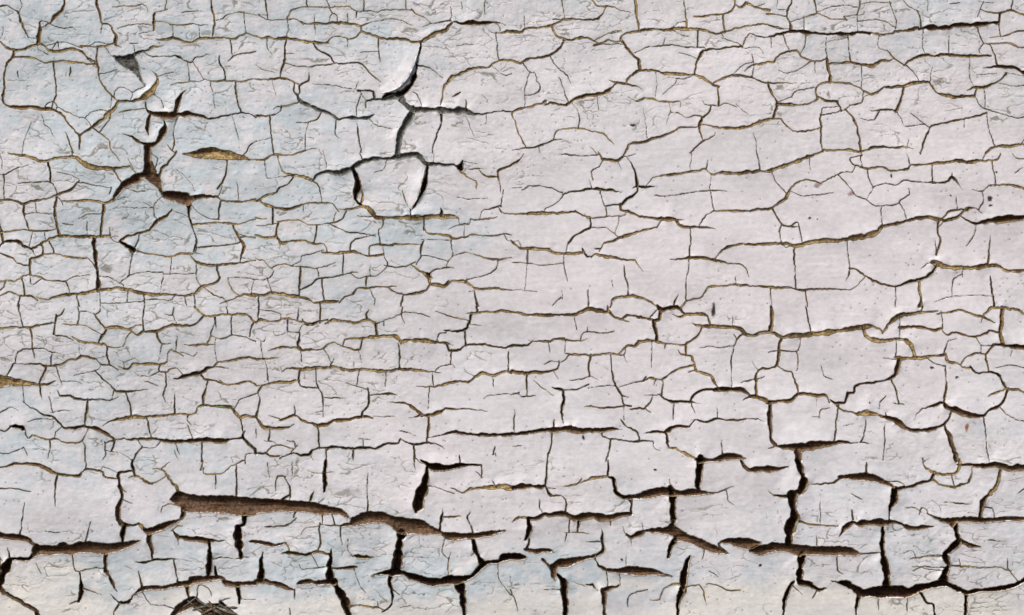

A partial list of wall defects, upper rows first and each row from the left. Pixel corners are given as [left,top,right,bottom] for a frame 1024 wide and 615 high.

crack [0,0,172,161]
crack [356,0,1024,291]
crack [0,343,661,542]
crack [644,409,765,447]
crack [740,460,789,473]
crack [0,560,40,615]
crack [71,555,133,615]
crack [135,516,295,615]
crack [300,522,428,569]
peeling [0,440,1024,615]
crack [572,573,648,615]
crack [839,510,933,585]